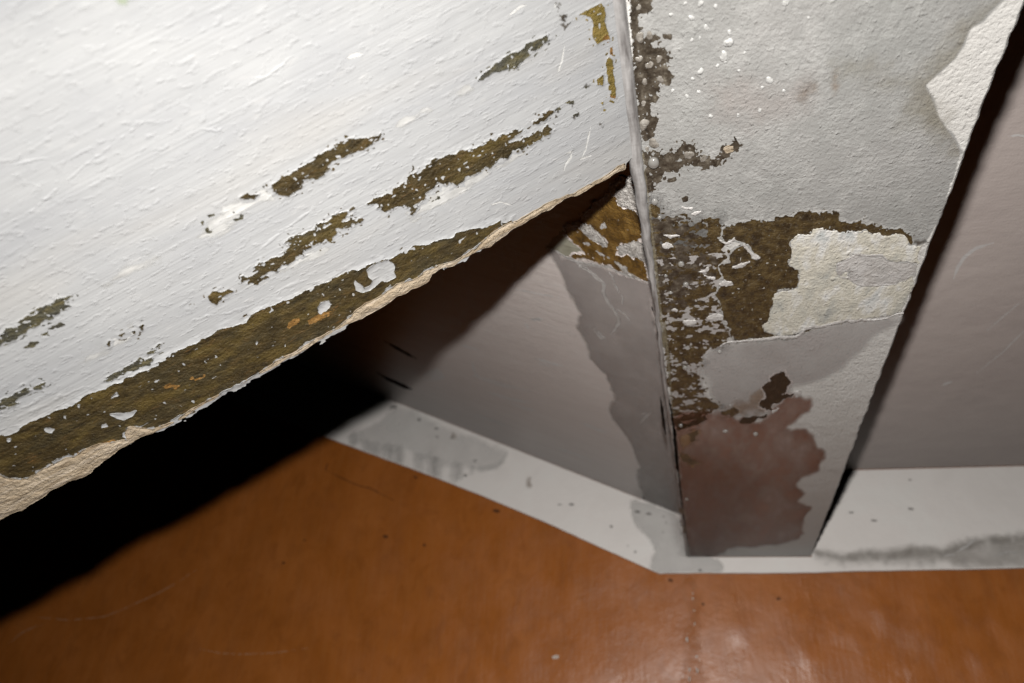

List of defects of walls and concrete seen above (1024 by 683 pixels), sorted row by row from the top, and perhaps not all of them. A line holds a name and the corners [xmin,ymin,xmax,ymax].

peeling [459,31,557,95]
peeling [575,0,619,112]
peeling [0,100,650,520]
leakage [552,0,1003,564]
spalling [712,206,924,347]